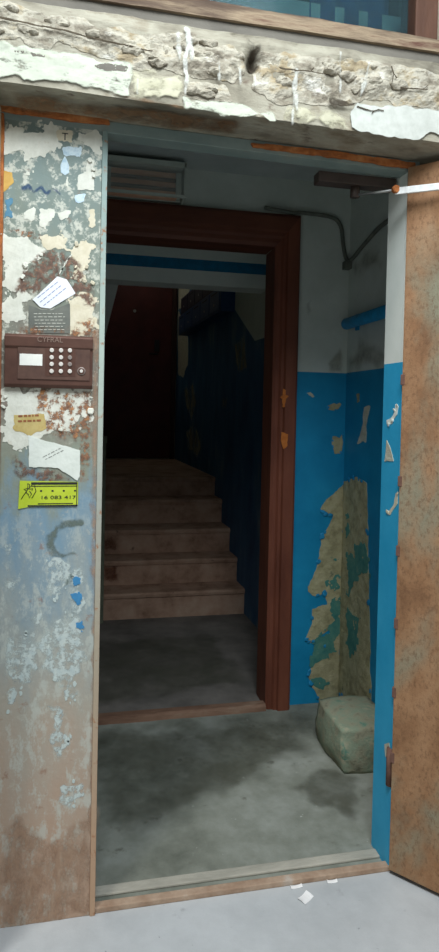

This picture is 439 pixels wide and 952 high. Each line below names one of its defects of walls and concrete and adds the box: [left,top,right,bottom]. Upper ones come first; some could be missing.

crack [0,16,153,52]
water stain [176,27,194,93]
spalling [0,0,439,140]
crack [391,66,428,90]
corrosion [0,105,110,264]
corrosion [251,143,416,169]
corrosion [16,250,95,307]
corrosion [15,321,99,488]
flaking render [305,475,372,700]
peeling [6,557,87,756]
peeling [60,779,84,808]